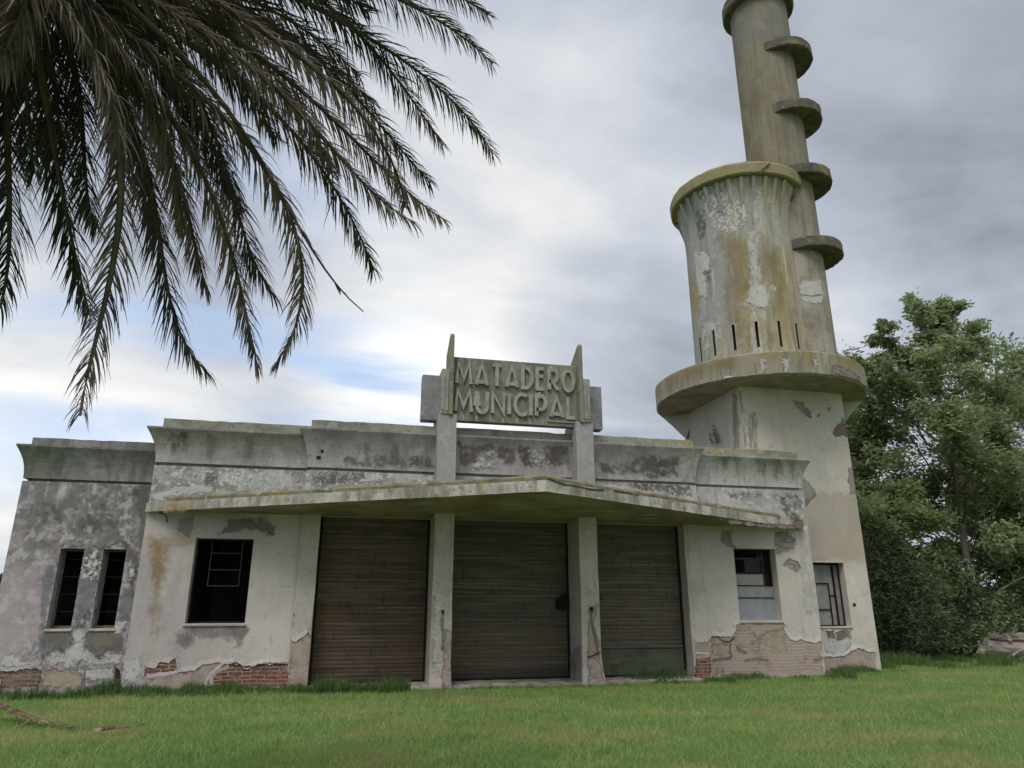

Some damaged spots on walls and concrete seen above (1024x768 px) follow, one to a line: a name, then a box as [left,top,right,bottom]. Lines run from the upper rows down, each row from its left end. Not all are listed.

peeling [692,182,777,311]
peeling [700,321,722,352]
flaking render [833,417,848,438]
peeling [81,546,102,581]
peeling [126,549,139,591]
flaking render [720,518,804,572]
flaking render [0,614,312,693]
spalling [570,604,607,686]
flaking render [692,620,879,679]